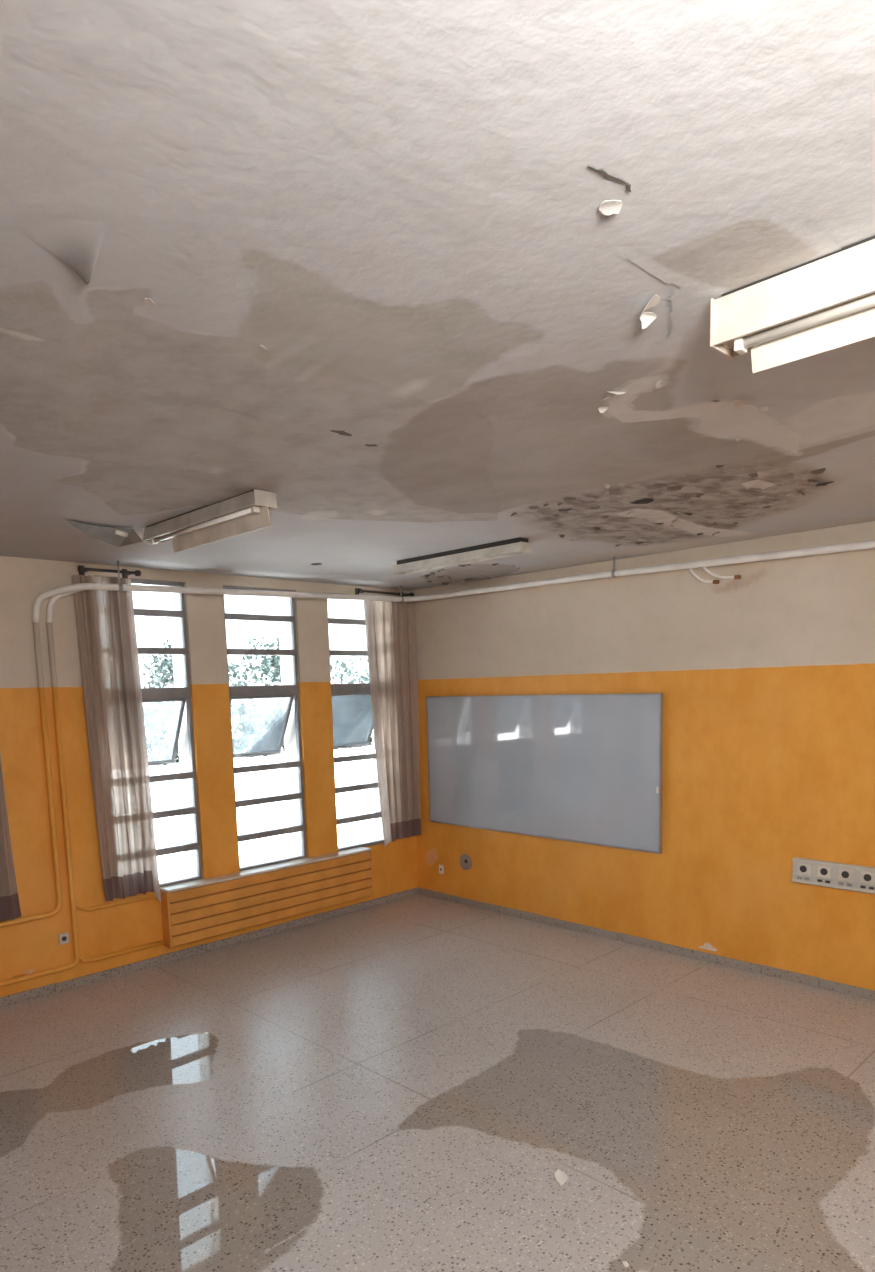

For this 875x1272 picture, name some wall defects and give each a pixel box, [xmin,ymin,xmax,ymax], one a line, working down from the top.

peeling [0,202,875,549]